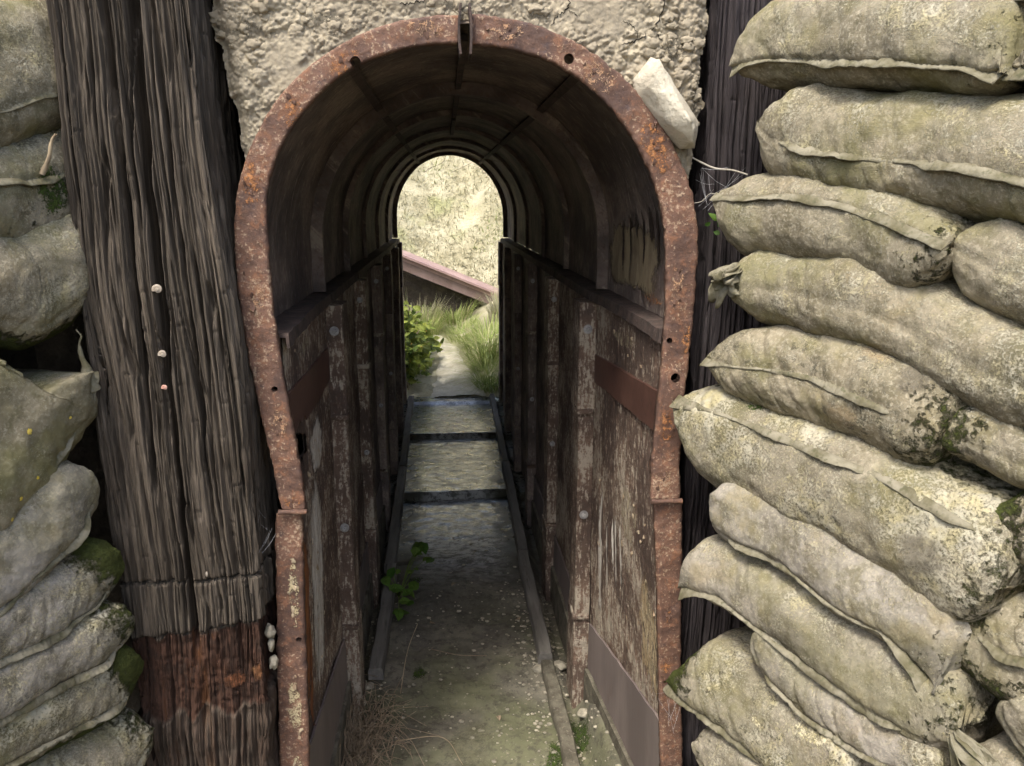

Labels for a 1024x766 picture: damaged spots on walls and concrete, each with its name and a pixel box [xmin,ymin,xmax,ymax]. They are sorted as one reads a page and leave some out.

crack [621,0,672,55]
corrosion [329,51,363,76]
corrosion [640,118,672,173]
corrosion [303,543,316,726]